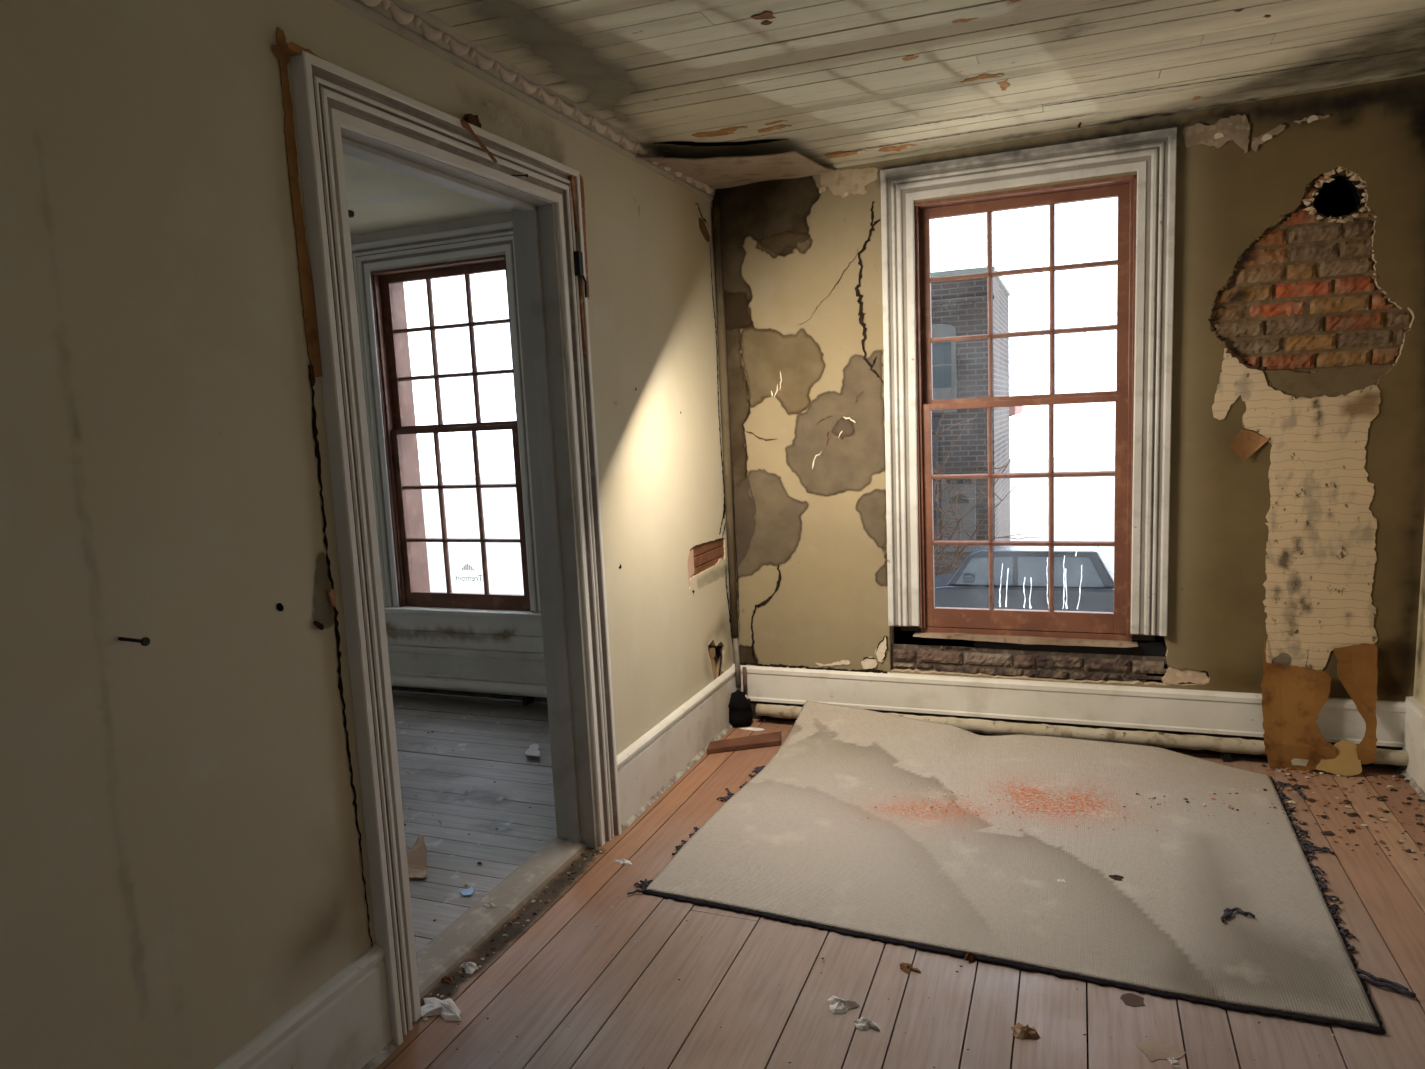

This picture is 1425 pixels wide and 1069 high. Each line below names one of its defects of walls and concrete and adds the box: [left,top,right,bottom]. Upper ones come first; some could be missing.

peeling [751,11,776,25]
peeling [961,73,1010,91]
leakage [1210,16,1425,149]
peeling [692,120,791,138]
leakage [1067,111,1183,149]
peeling [1181,114,1330,153]
leakage [885,172,908,186]
crack [799,202,883,383]
flaking render [1208,167,1412,399]
crack [710,243,888,674]
spalling [688,538,724,593]